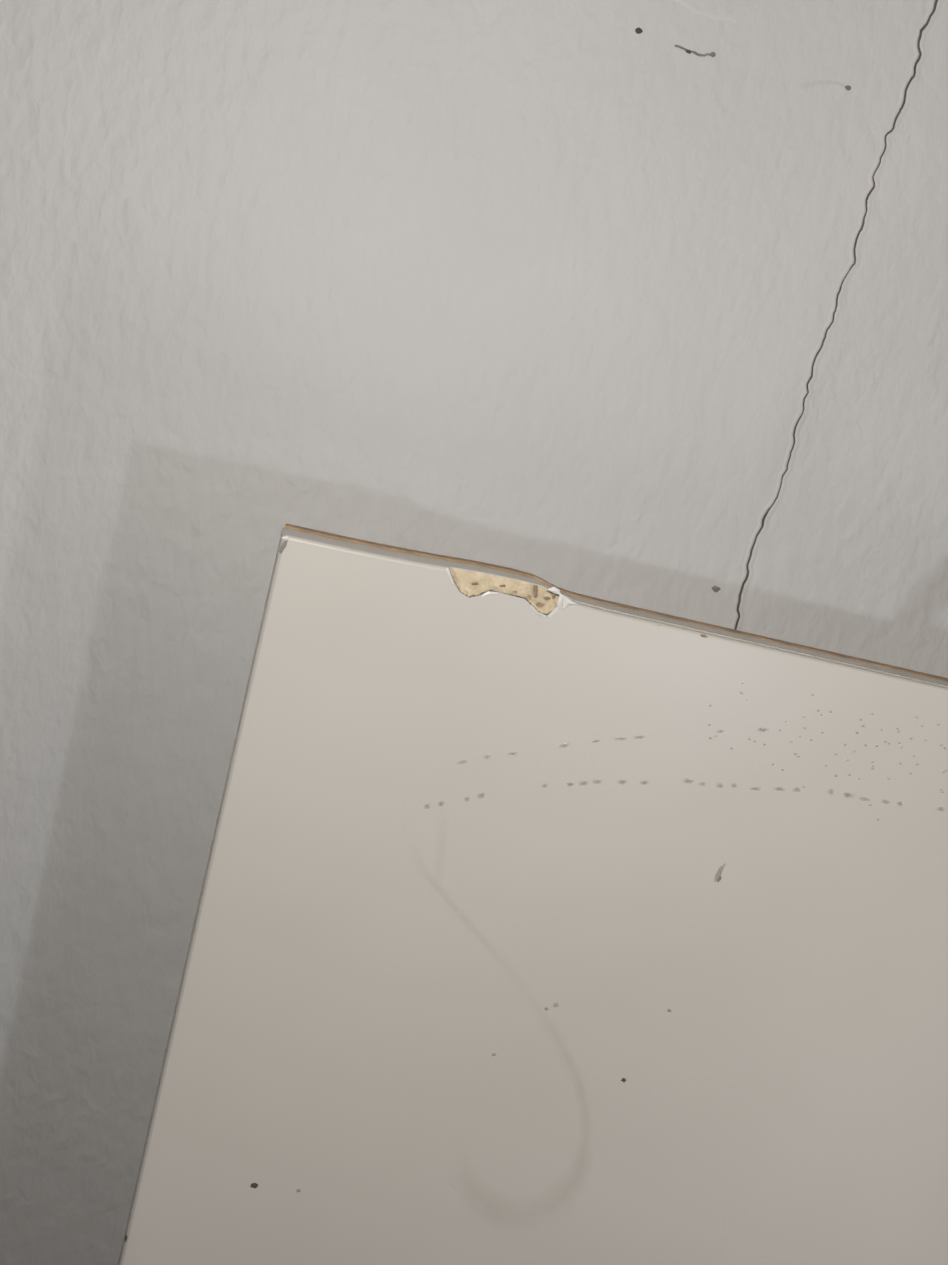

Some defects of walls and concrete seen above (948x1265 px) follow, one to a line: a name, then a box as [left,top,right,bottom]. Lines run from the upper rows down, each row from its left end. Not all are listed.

spalling [446,568,576,618]
crack [730,0,945,631]